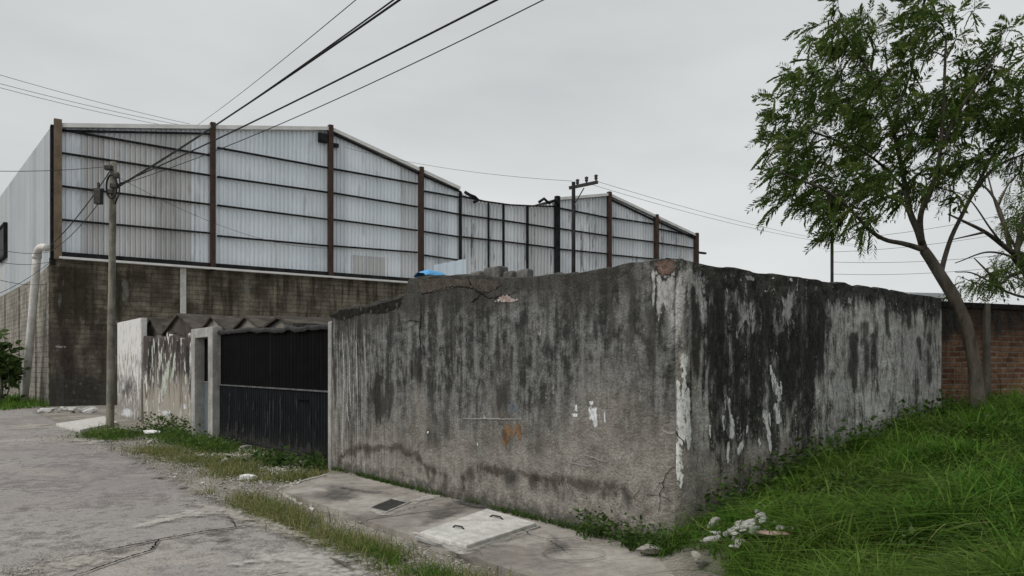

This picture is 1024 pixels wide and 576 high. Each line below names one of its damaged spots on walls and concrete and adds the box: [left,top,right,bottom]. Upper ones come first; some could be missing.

damp [148,341,189,378]
damp [342,333,366,421]
damp [371,374,394,425]
crack [407,277,517,378]
spalling [417,278,518,302]
peeling [572,401,605,427]
flaking render [651,259,675,334]
damp [676,285,826,488]
damp [848,309,890,407]
damp [906,301,932,385]
damp [461,467,627,499]
crack [636,423,684,512]